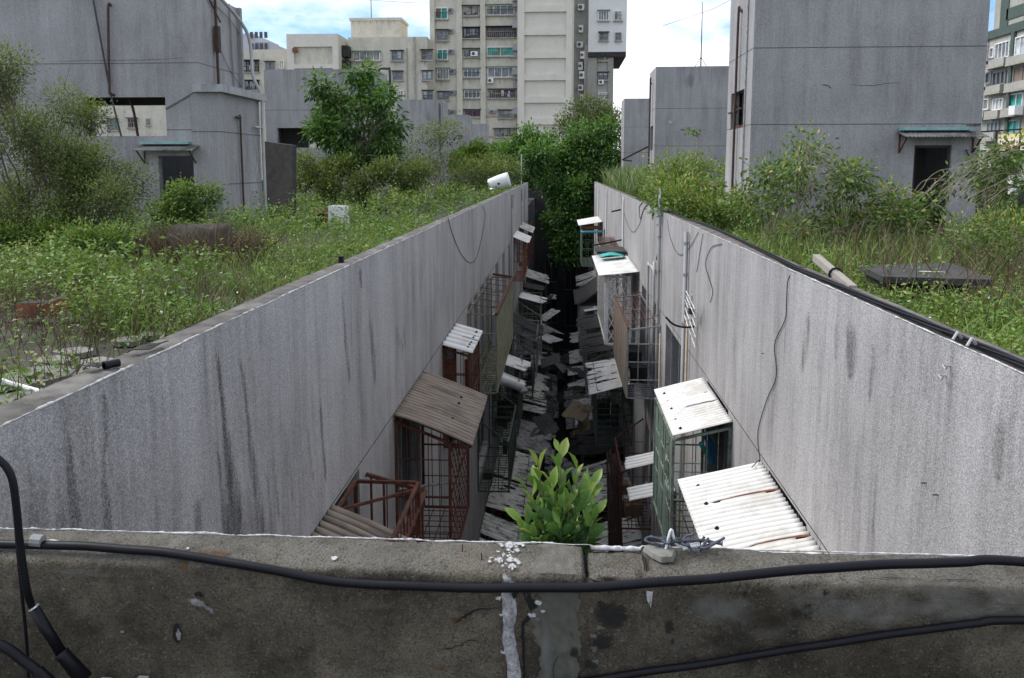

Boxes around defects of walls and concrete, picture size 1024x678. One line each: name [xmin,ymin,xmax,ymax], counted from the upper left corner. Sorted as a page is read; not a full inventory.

damp [218,357,244,535]
efflorescence [488,542,545,678]